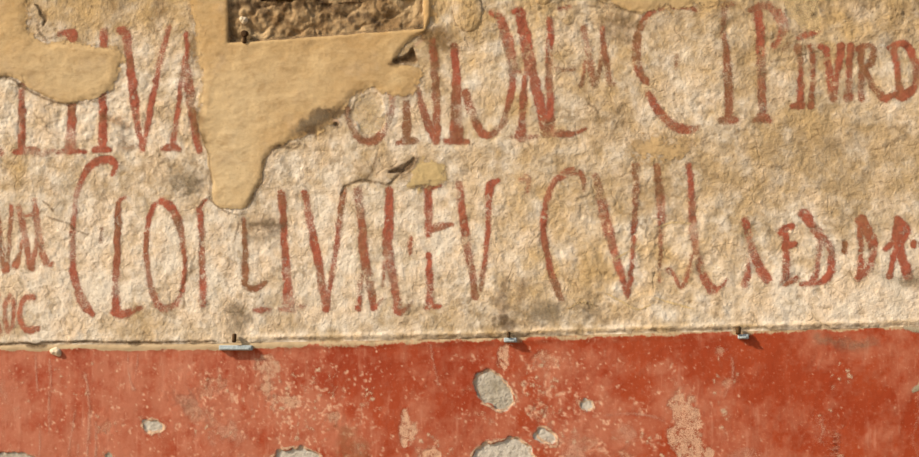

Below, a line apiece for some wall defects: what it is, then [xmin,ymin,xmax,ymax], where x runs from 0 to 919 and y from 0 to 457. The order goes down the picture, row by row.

flaking render [390,34,425,65]
flaking render [389,157,416,173]
peeling [253,353,340,457]
flaking render [464,342,637,457]
flaking render [138,415,165,438]